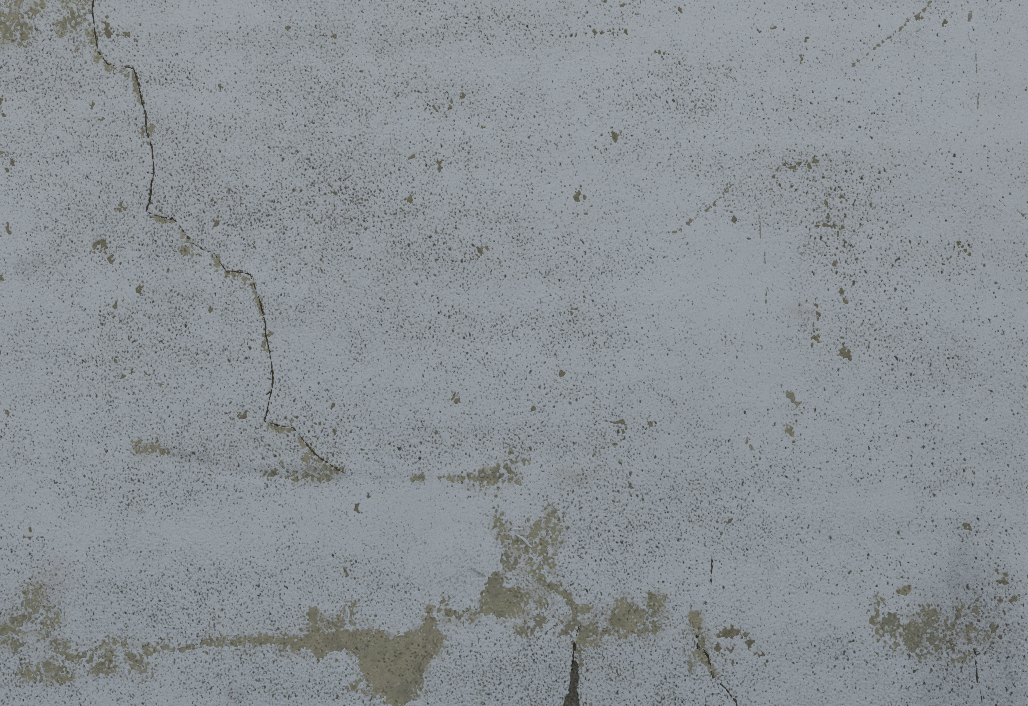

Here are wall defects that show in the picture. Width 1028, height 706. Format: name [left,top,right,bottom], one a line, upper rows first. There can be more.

peeling [0,0,139,58]
crack [90,0,344,484]
spalling [131,439,175,458]
spalling [438,448,531,488]
peeling [0,502,677,706]
crack [563,627,580,706]
peeling [687,611,767,679]
peeling [866,569,1020,664]